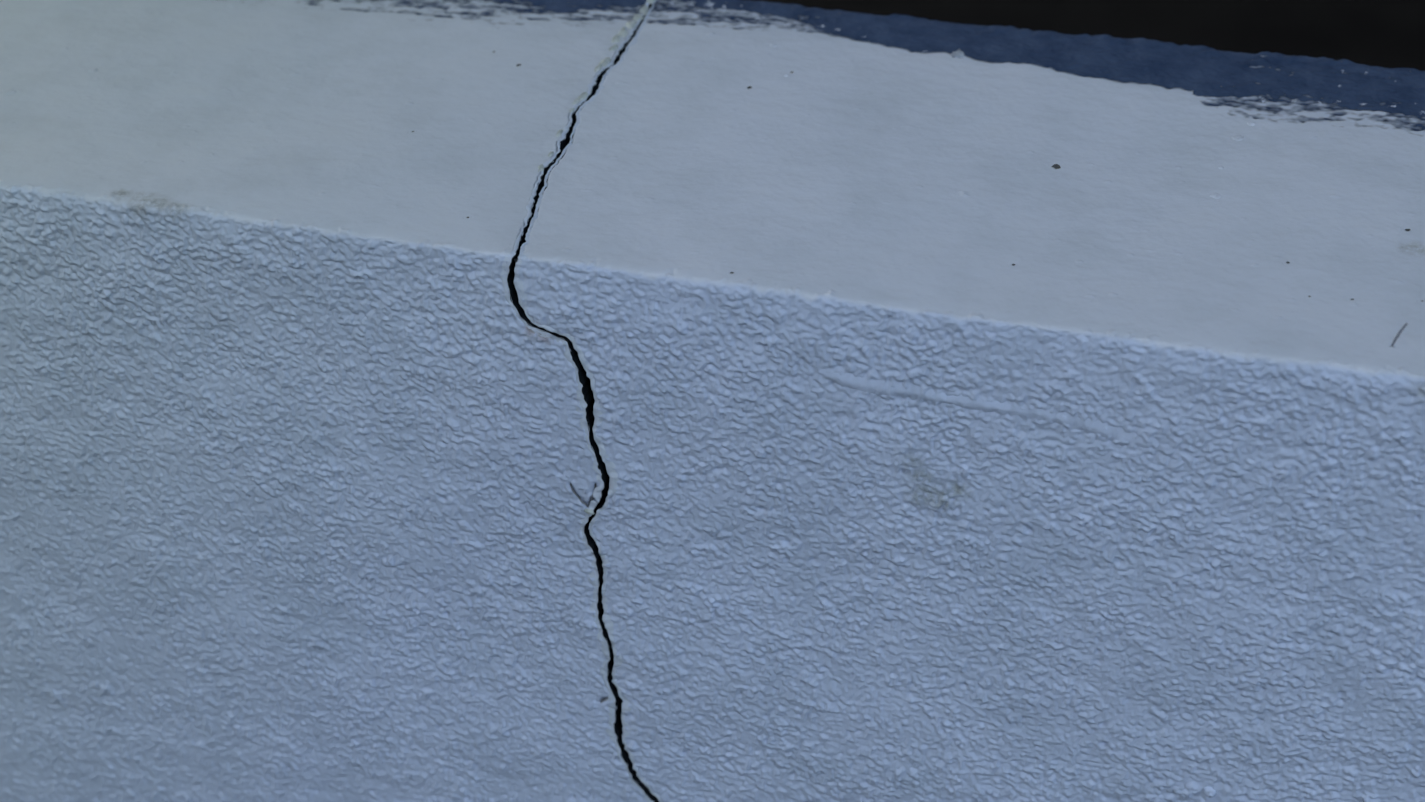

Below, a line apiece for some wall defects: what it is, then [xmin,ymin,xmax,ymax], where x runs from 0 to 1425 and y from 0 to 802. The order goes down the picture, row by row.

crack [500,0,663,802]